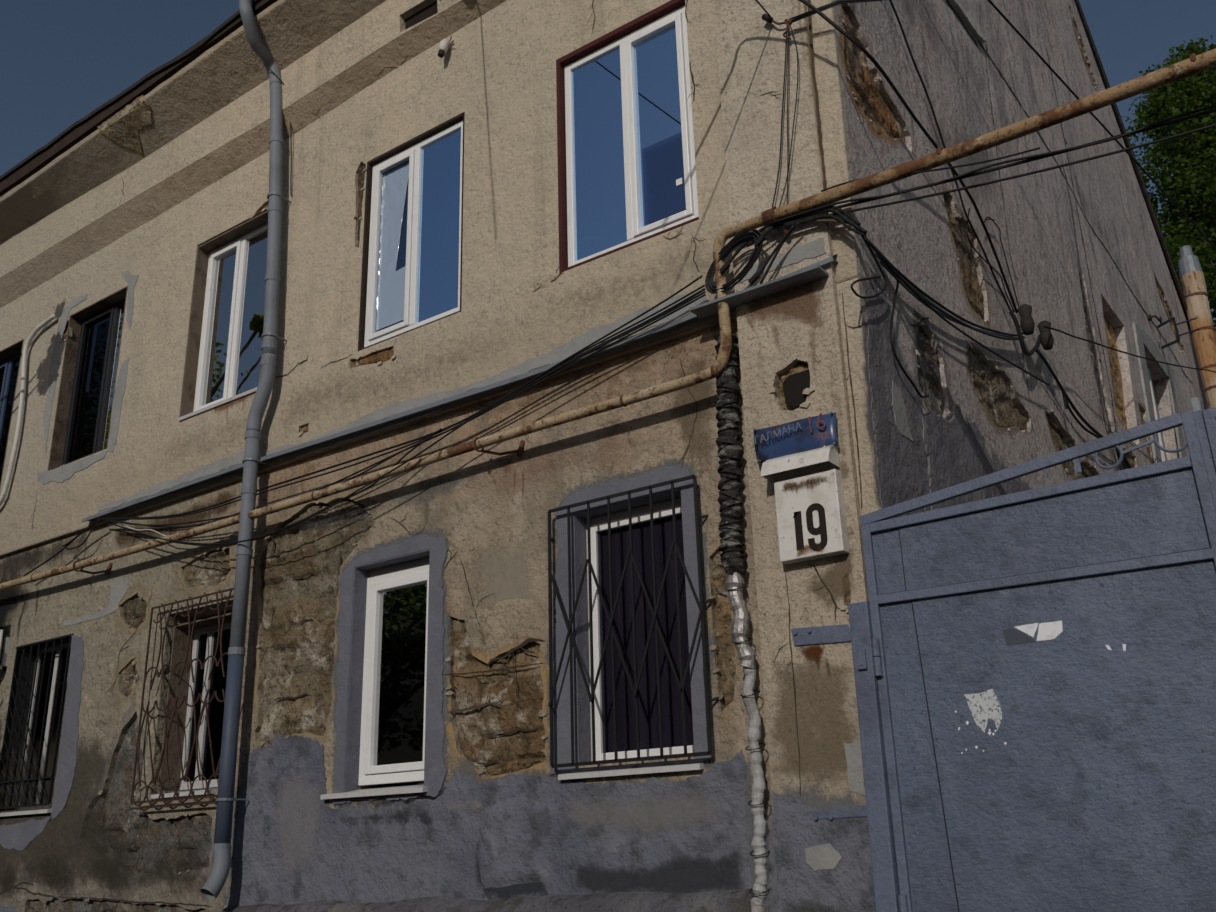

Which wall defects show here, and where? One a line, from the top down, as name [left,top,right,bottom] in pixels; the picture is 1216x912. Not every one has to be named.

flaking render [97,94,152,154]
flaking render [840,4,905,145]
flaking render [943,188,990,328]
flaking render [352,348,396,368]
flaking render [913,312,952,419]
flaking render [966,341,1032,433]
flaking render [1045,409,1097,480]
flaking render [116,584,151,635]
flaking render [176,542,236,594]
flaking render [251,489,376,749]
flaking render [444,605,550,782]
flaking render [21,654,214,912]